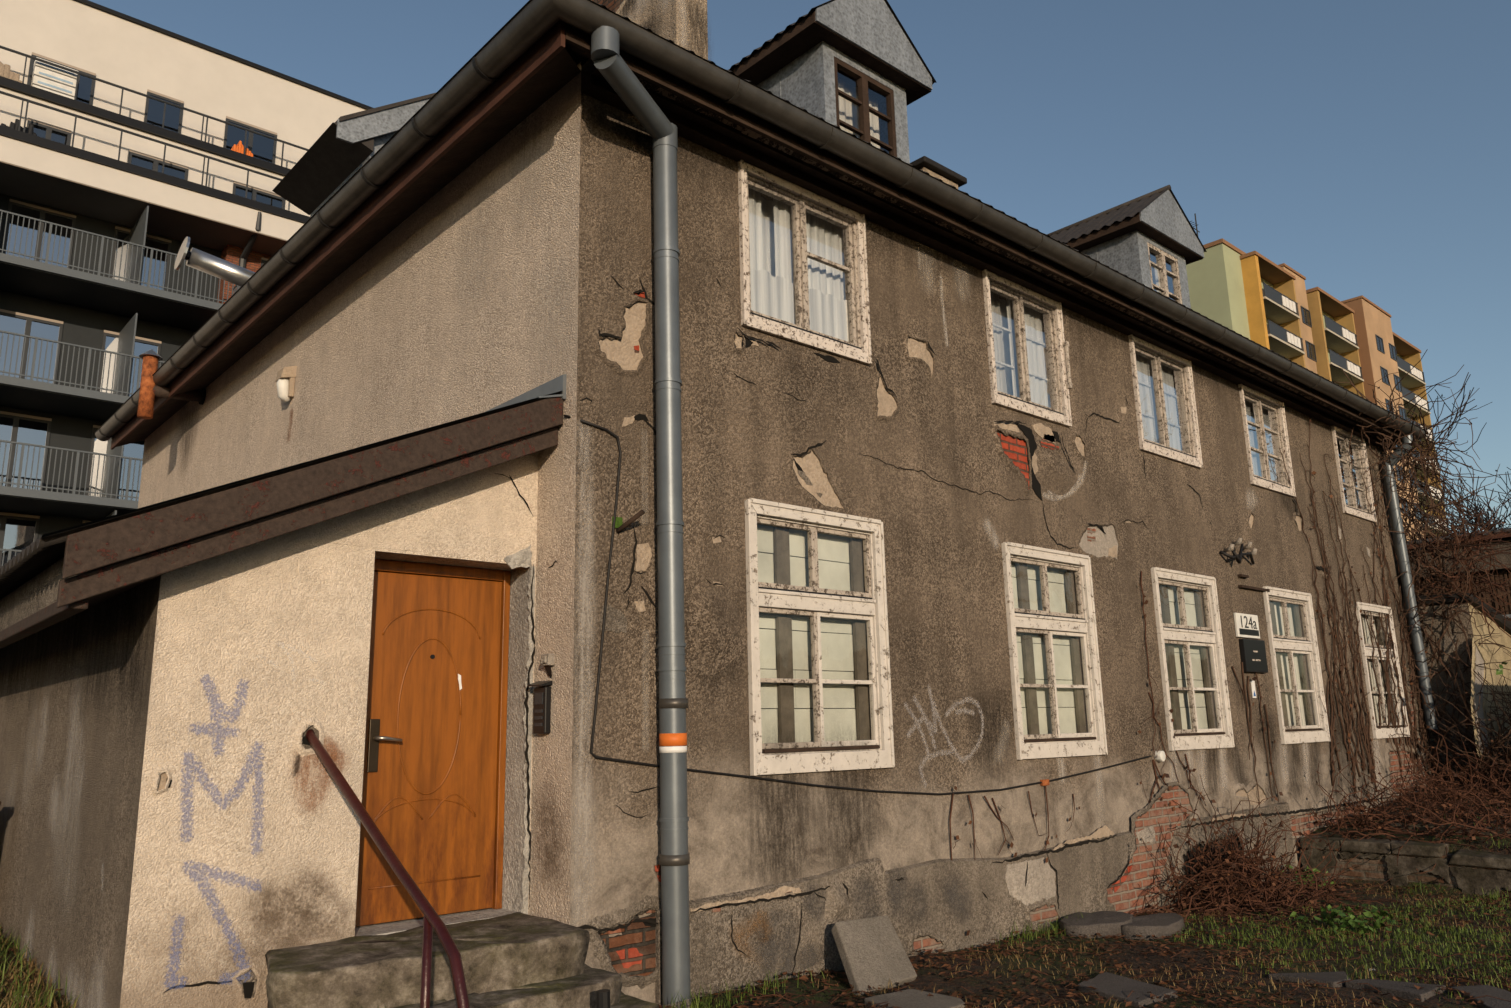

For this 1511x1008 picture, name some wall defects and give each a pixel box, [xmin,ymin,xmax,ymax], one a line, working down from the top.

peeling [592,290,652,377]
peeling [872,359,900,422]
peeling [903,332,936,381]
peeling [787,441,847,514]
flaking render [992,420,1087,501]
peeling [1075,520,1121,564]
flaking render [578,859,661,989]
peeling [1005,857,1061,930]
crack [982,825,1116,909]
flaking render [1103,781,1249,914]